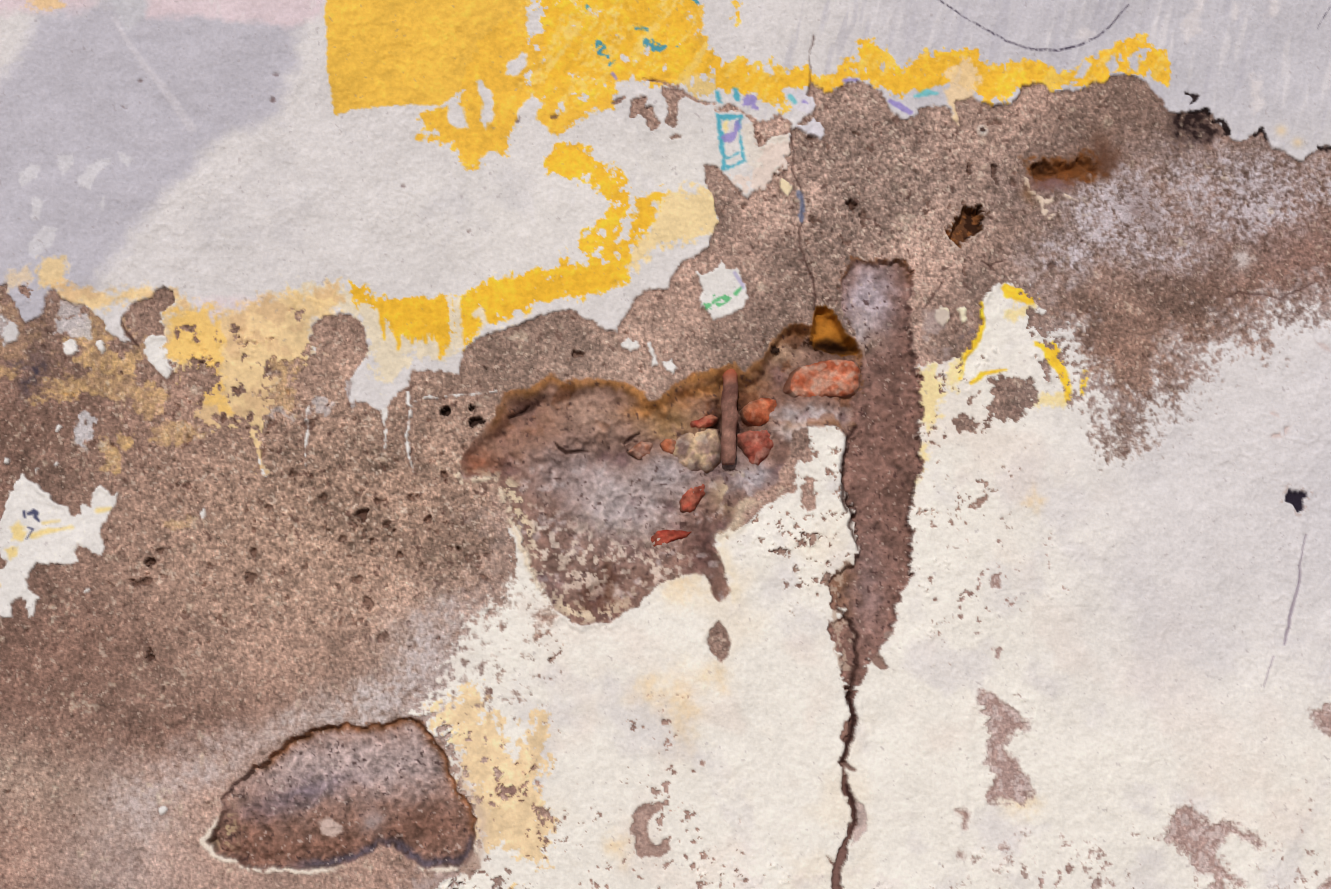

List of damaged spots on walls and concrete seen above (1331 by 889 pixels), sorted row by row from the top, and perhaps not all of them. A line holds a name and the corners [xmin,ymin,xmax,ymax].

crack [806,35,816,96]
crack [790,128,819,311]
peeling [473,75,1331,705]
peeling [0,284,863,889]
crack [828,688,869,889]
peeling [977,689,1038,807]
peeling [1164,806,1264,889]
peeling [1310,704,1331,737]